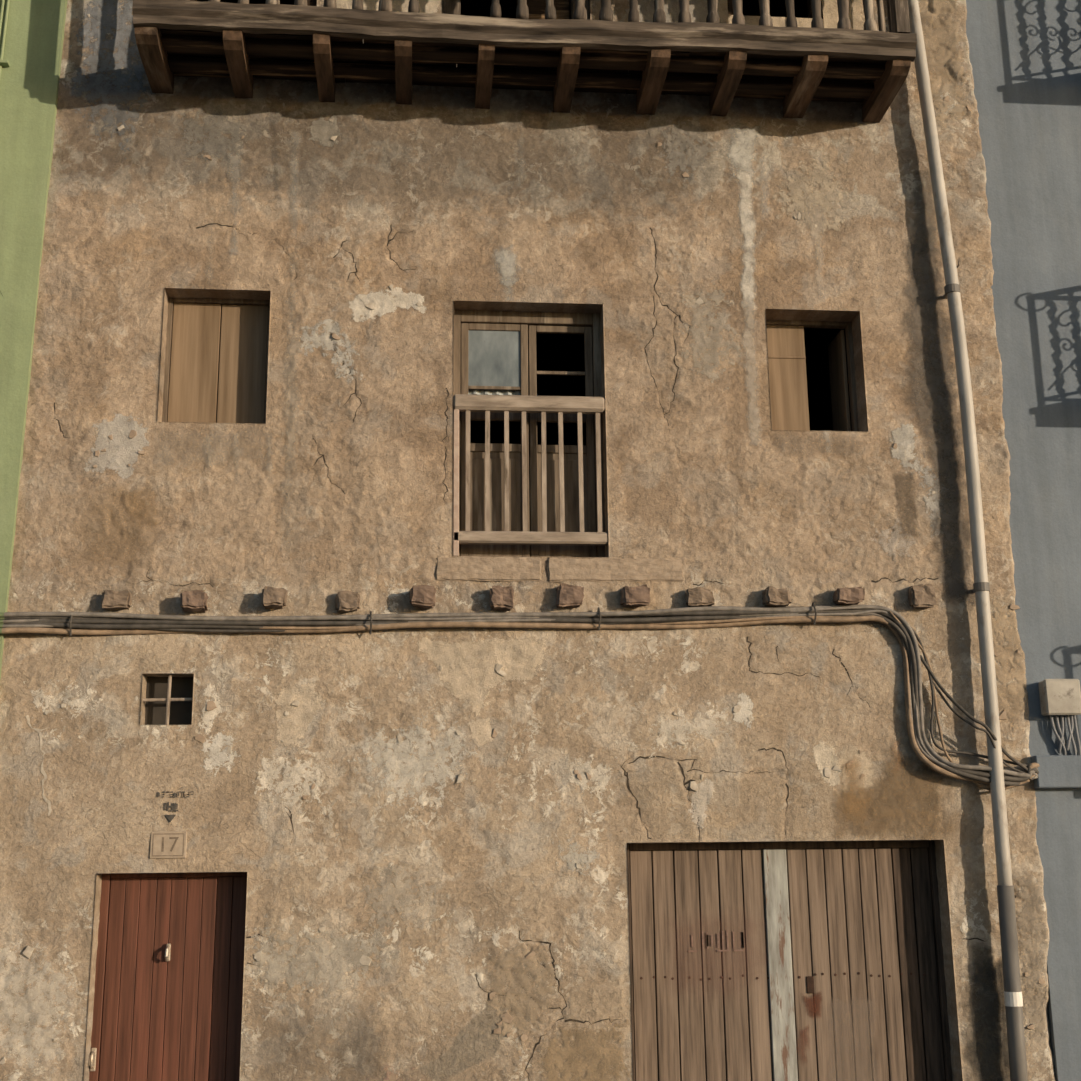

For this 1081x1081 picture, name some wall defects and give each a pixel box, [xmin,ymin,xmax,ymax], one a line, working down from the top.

crack [331,340,362,422]
peeling [294,284,427,383]
crack [645,228,690,426]
leakage [729,127,760,444]
crack [313,438,345,494]
crack [747,637,870,707]
crack [621,748,789,842]
crack [475,931,623,1079]